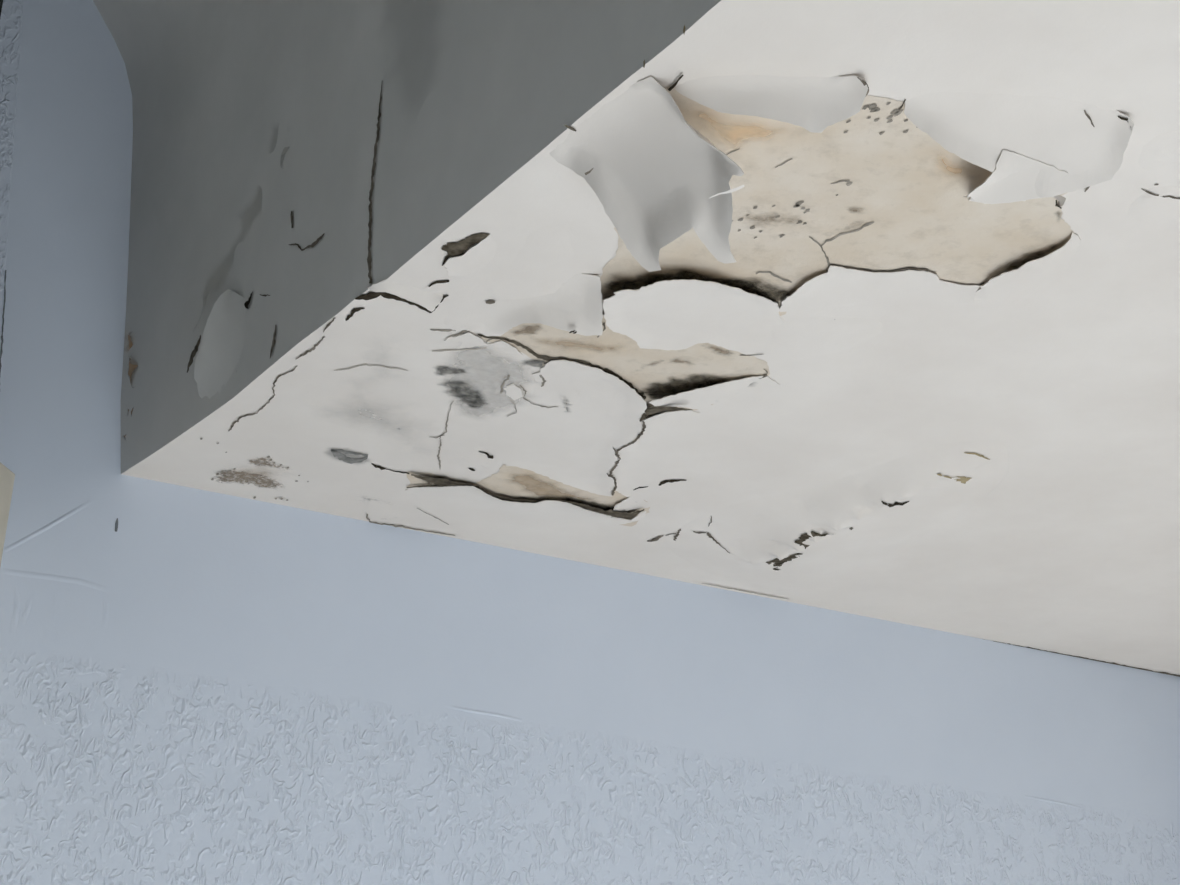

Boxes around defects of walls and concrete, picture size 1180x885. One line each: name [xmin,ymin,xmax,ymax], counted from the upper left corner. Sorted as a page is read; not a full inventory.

crack [229,80,492,431]
peeling [444,60,1134,422]
mould [437,366,483,407]
mould [432,332,546,387]
mould [500,375,568,417]
peeling [405,465,650,533]